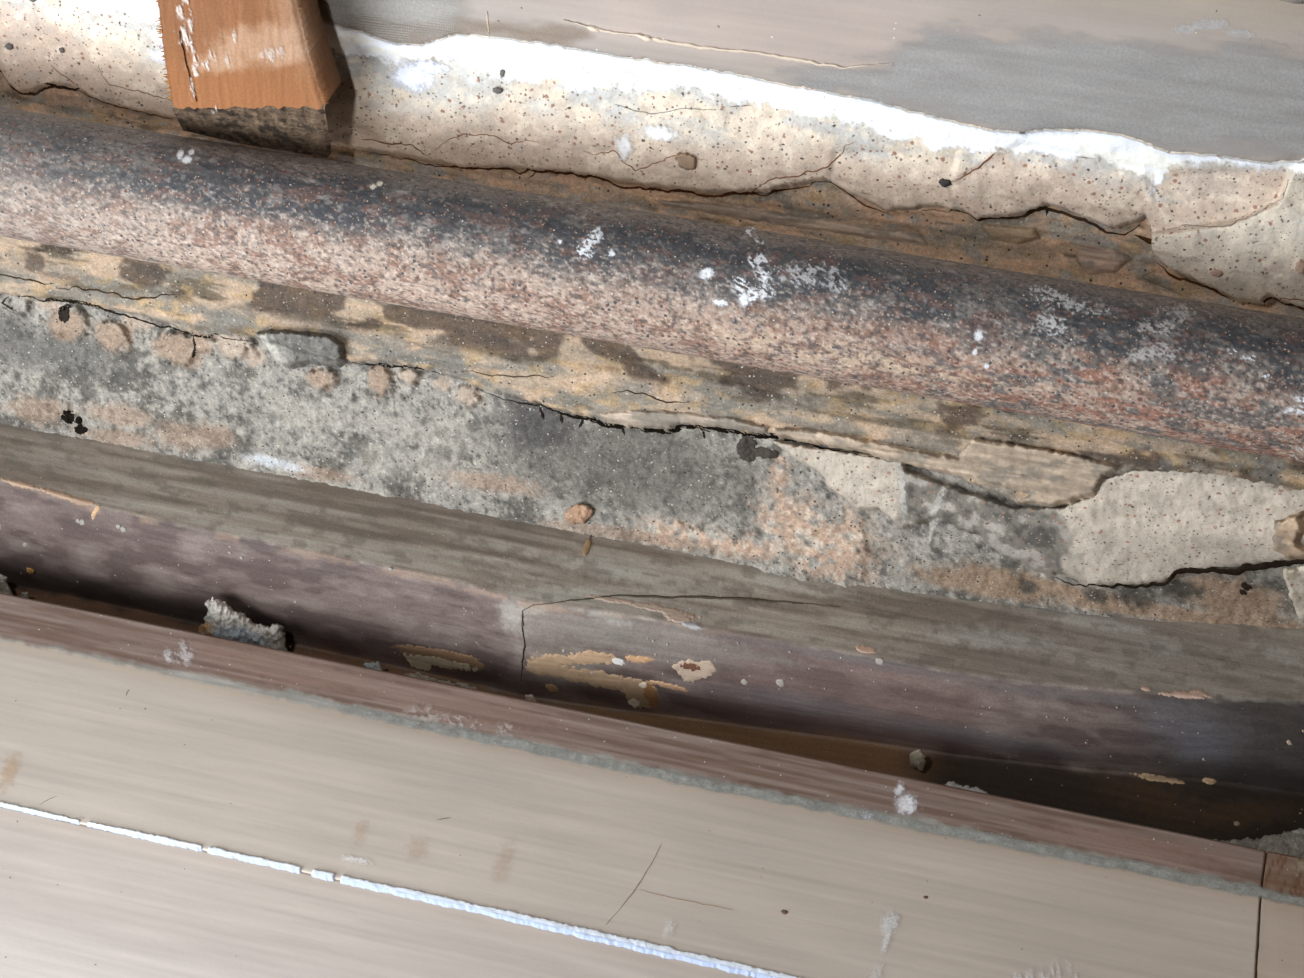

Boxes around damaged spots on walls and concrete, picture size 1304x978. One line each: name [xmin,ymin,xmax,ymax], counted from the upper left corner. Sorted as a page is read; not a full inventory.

crack [0,32,197,119]
crack [362,133,888,214]
crack [923,132,1304,310]
crack [0,274,255,358]
crack [350,362,888,462]
peeling [600,409,1123,508]
peeling [1272,511,1304,560]
peeling [394,652,478,672]
peeling [612,655,654,666]
peeling [628,680,688,709]
crack [521,594,840,676]
peeling [680,662,700,672]